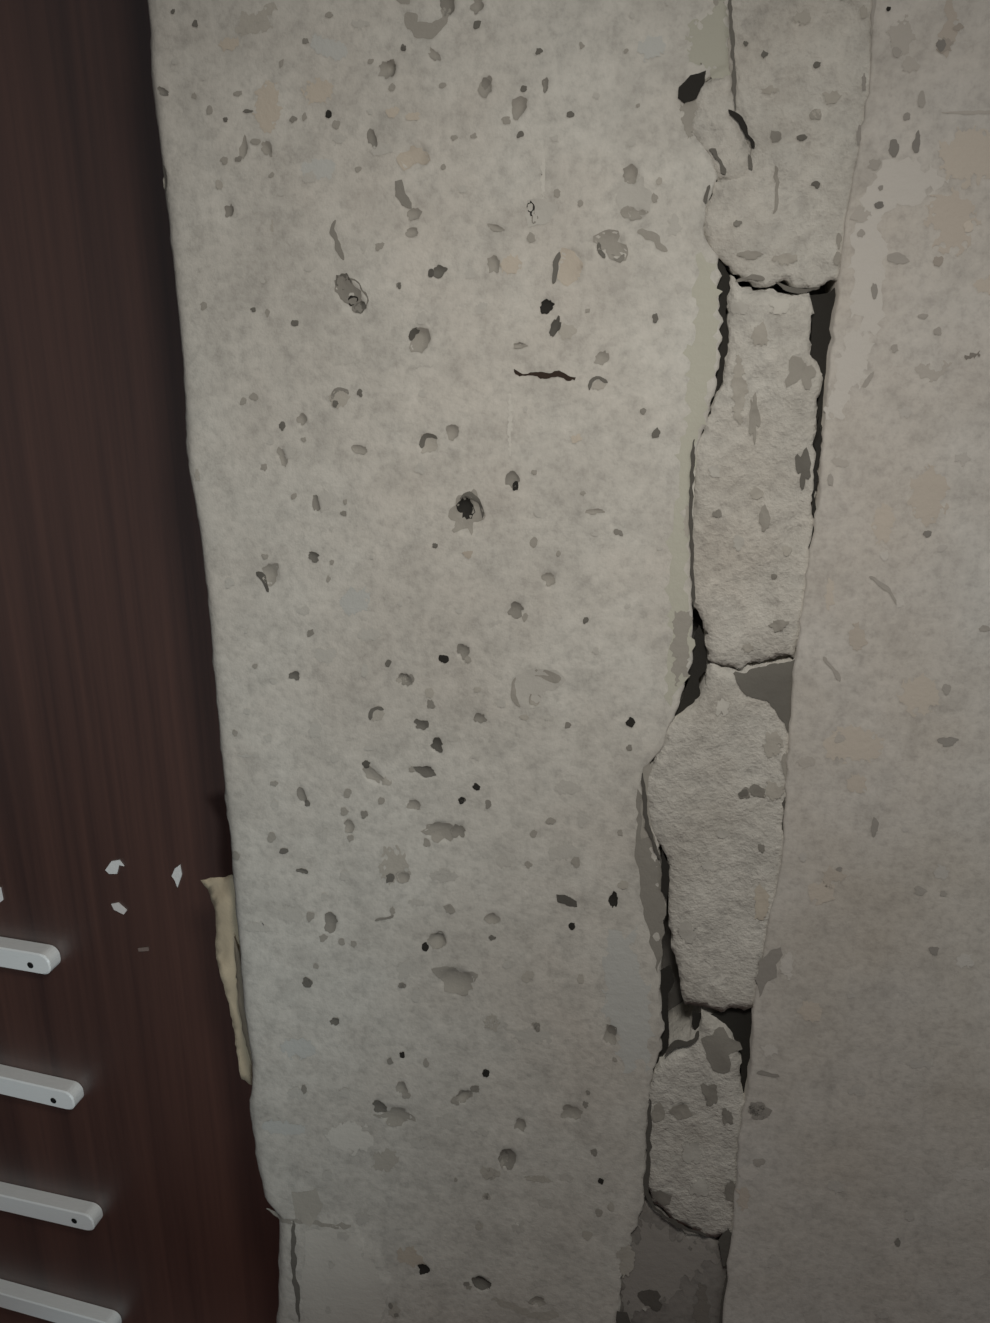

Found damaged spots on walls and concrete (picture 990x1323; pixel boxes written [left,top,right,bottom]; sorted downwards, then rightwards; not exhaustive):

crack [703,0,780,214]
spalling [867,90,926,209]
spalling [593,193,658,261]
crack [688,439,696,609]
crack [808,424,822,548]
spalling [733,660,795,733]
spalling [608,891,618,908]
spalling [617,762,666,971]
crack [641,773,661,860]
spalling [738,784,766,799]
crack [665,1031,699,1056]
crack [643,1099,708,1236]